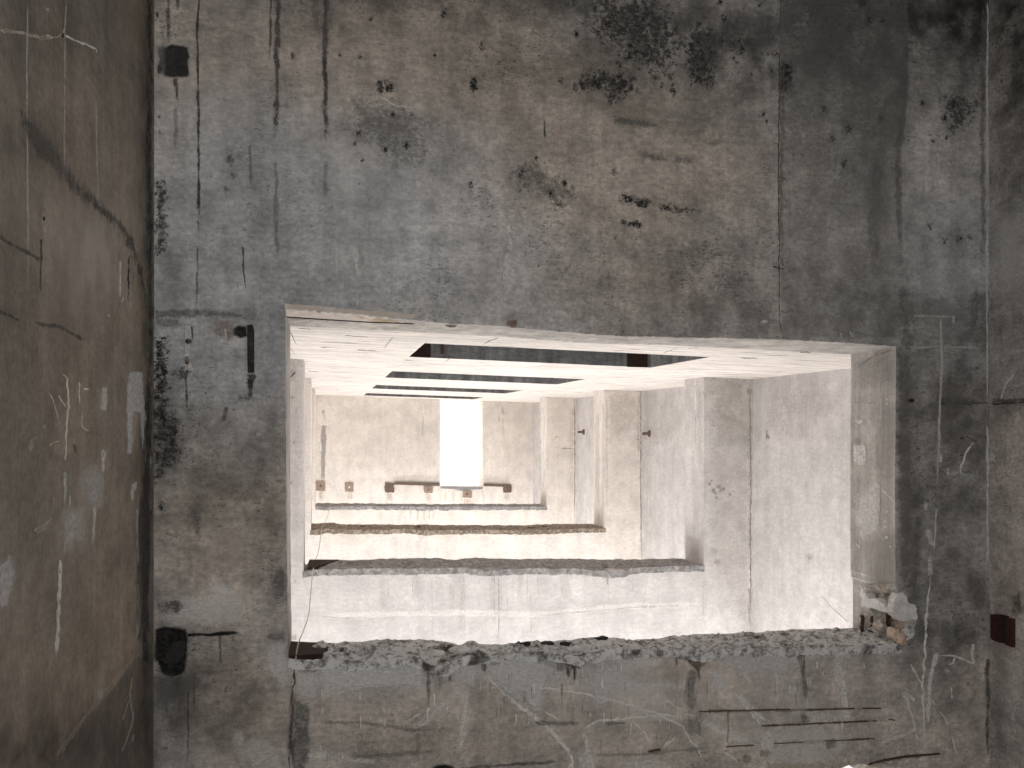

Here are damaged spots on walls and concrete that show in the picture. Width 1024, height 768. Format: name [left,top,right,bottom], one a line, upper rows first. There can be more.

leakage [269,0,294,126]
leakage [321,0,342,140]
leakage [375,79,413,119]
leakage [557,0,727,127]
leakage [509,155,577,211]
leakage [622,193,701,213]
leakage [21,0,241,758]
crack [908,396,1024,439]
spalling [858,583,918,645]